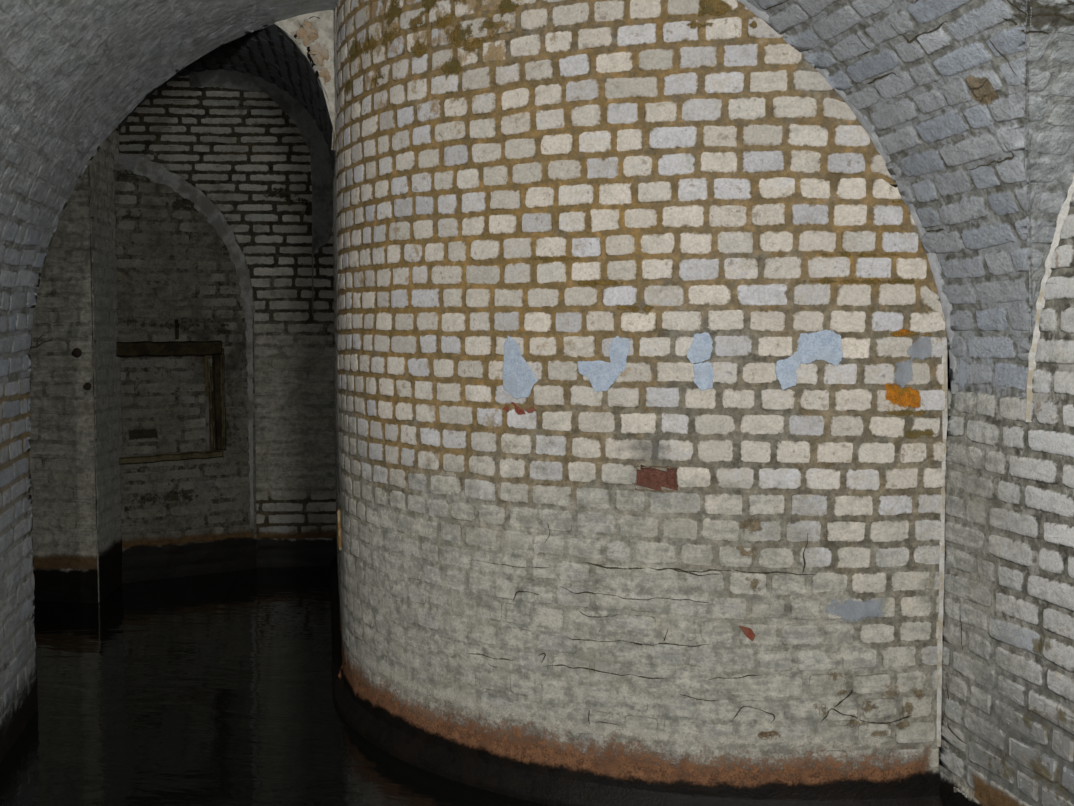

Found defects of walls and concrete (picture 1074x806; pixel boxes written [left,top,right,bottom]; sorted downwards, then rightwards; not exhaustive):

damp [349,0,519,79]
damp [687,0,732,29]
peeling [503,336,538,415]
peeling [577,336,629,392]
peeling [687,332,714,391]
peeling [775,330,843,390]
crack [470,523,815,647]
damp [33,537,982,806]
crack [471,653,775,724]
crack [822,689,912,724]